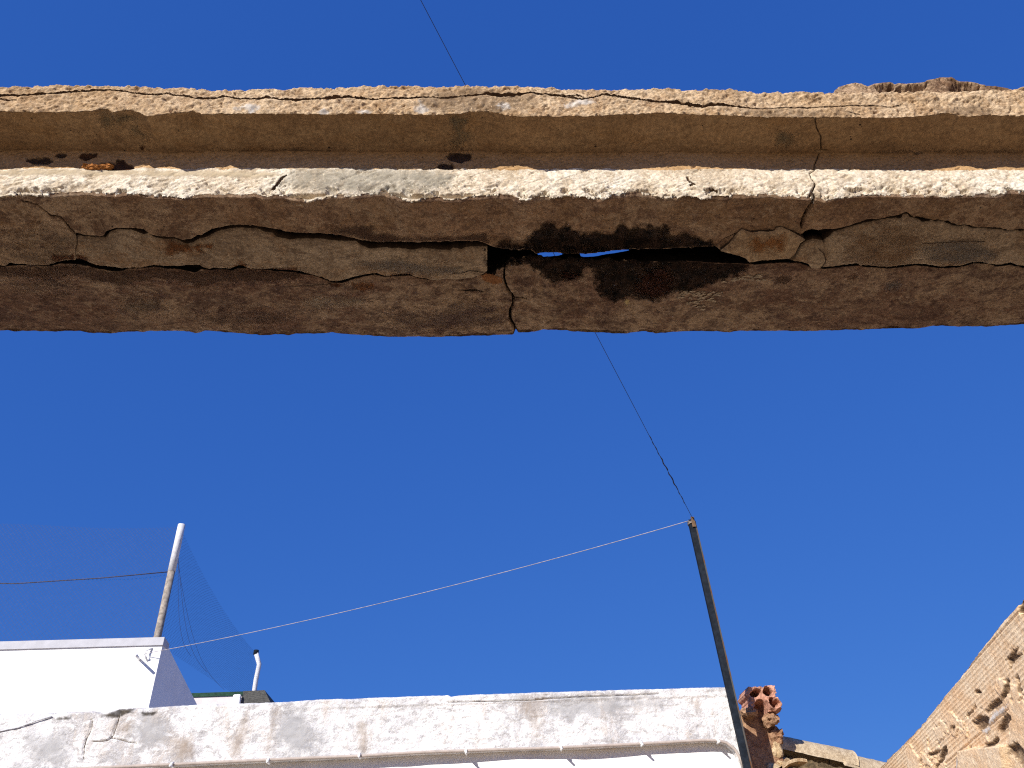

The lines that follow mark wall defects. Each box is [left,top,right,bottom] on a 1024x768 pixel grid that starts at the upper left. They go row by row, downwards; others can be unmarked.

crack [0,89,903,263]
crack [453,256,527,326]
water stain [484,223,749,303]
crack [924,238,986,246]